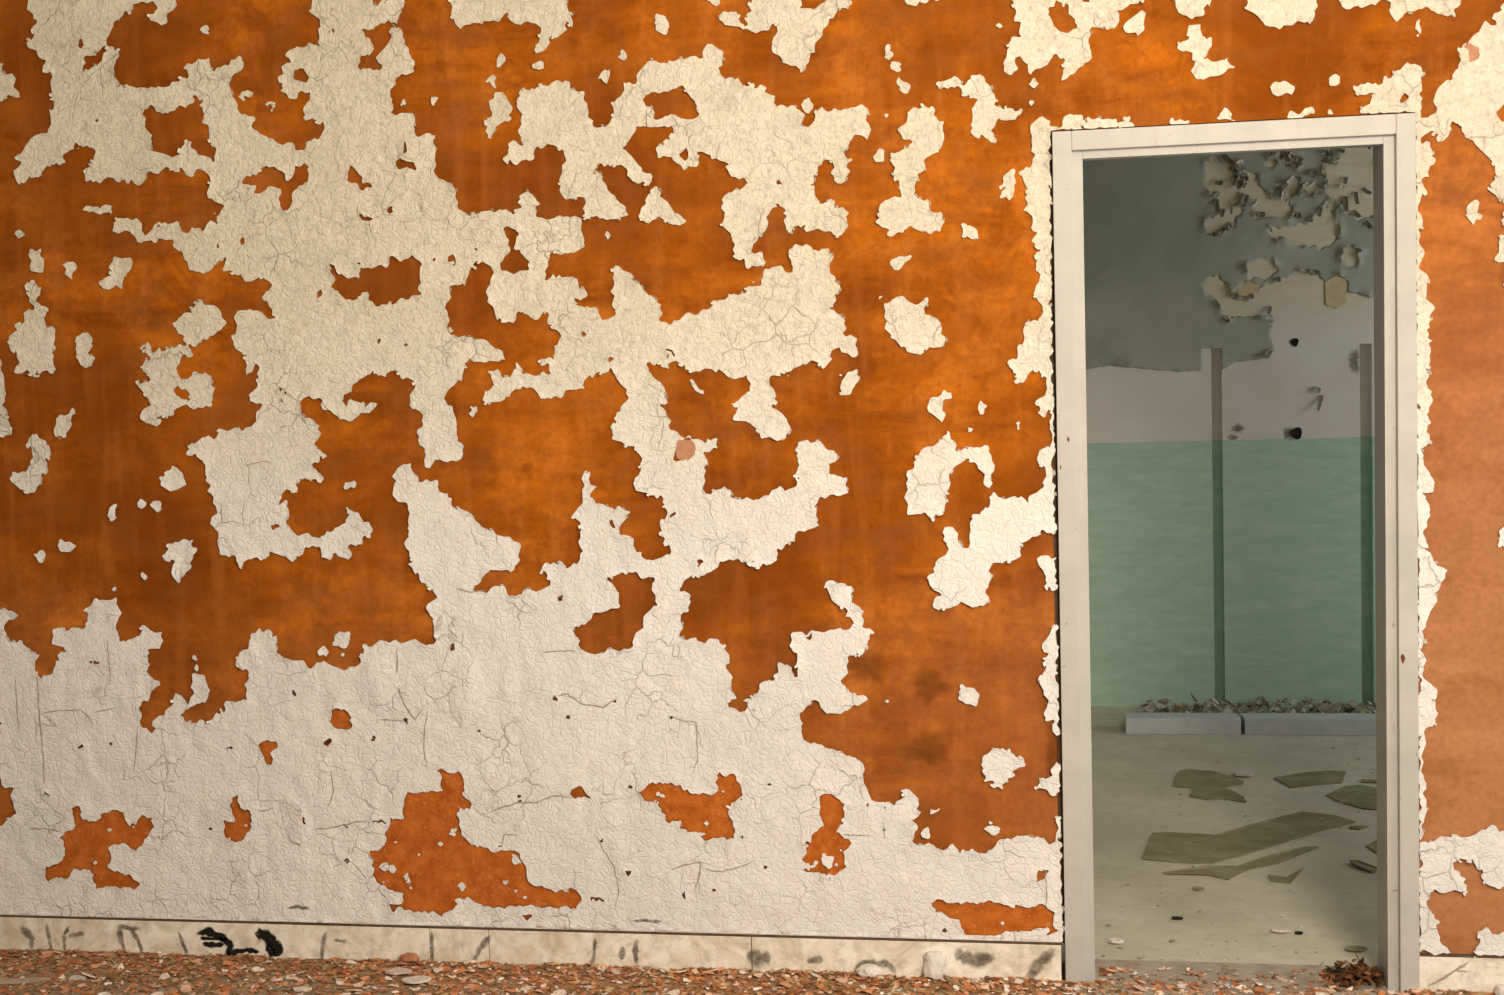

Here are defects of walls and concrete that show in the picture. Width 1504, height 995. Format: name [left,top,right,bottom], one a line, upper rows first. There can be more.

peeling [1173,0,1235,80]
peeling [1244,0,1318,29]
peeling [1217,108,1235,121]
peeling [1270,81,1333,119]
peeling [904,0,1146,611]
peeling [1083,148,1374,372]
peeling [0,0,1065,942]
peeling [1329,0,1504,958]
crack [15,641,138,784]
crack [381,650,428,763]
crack [315,773,366,867]
crack [487,795,573,845]